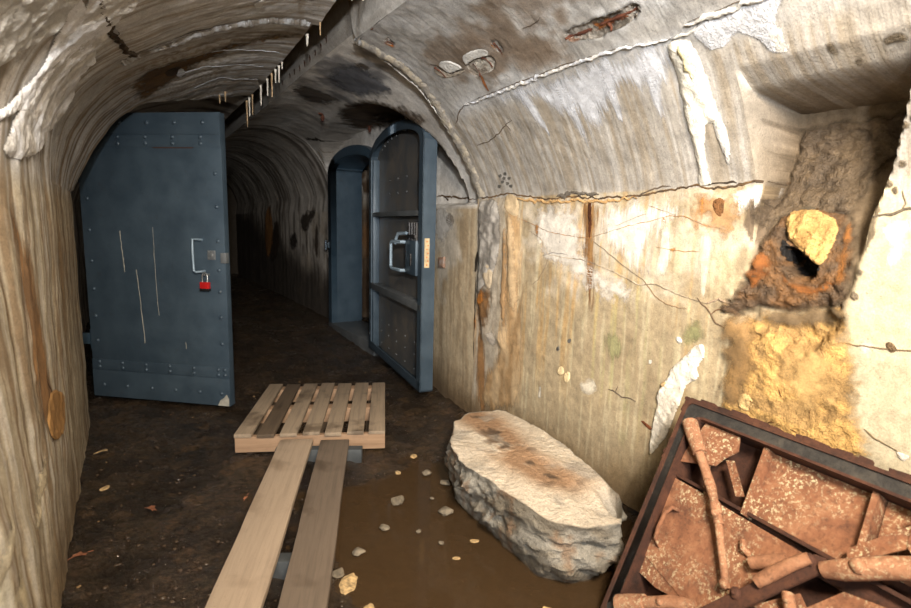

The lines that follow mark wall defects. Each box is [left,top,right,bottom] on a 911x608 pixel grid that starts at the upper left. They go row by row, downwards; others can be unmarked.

spalling [565,4,640,40]
leakage [693,0,789,53]
spalling [431,40,503,91]
crack [872,190,911,217]
corrosion [583,203,599,306]
crack [437,180,791,328]
spalling [681,111,907,466]